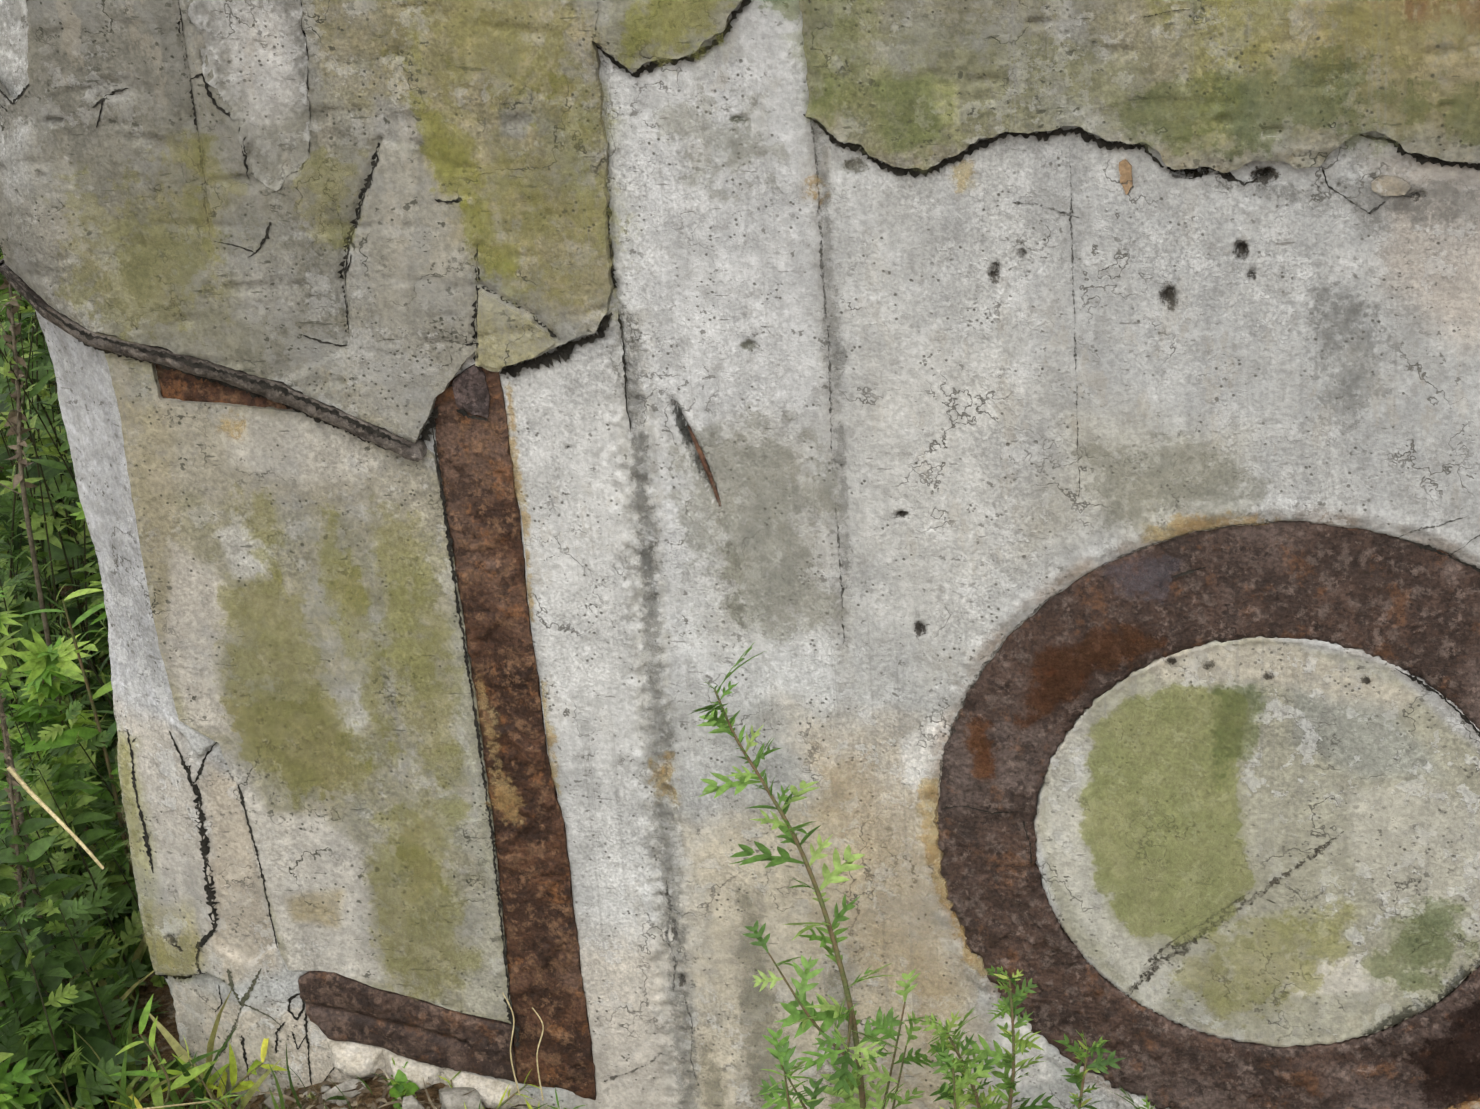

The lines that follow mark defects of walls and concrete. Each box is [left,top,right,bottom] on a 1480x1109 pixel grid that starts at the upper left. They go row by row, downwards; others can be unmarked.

crack [177,1,271,257]
flaking render [0,0,741,443]
crack [435,196,463,204]
flaking render [799,0,1480,195]
spalling [1161,285,1175,310]
spalling [1236,242,1253,276]
spalling [1371,174,1426,199]
spalling [677,412,722,507]
crack [5,202,631,1085]
crack [1127,831,1344,997]